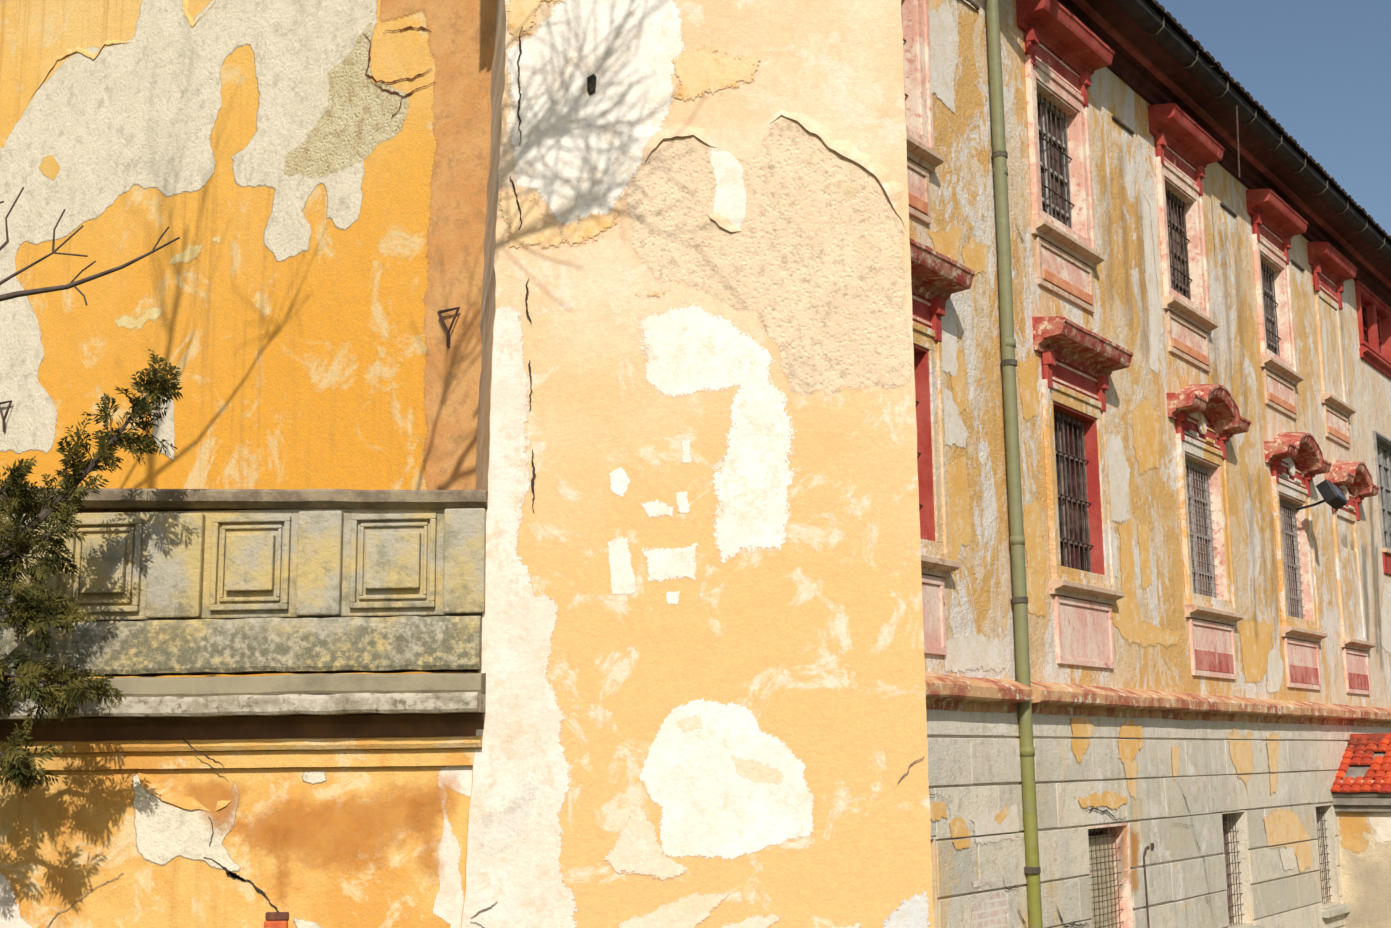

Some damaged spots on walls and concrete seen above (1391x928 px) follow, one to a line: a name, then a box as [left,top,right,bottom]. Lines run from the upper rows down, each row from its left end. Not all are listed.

crack [364,26,436,118]
crack [510,26,523,229]
crack [524,278,532,324]
crack [526,361,534,411]
flaking render [0,0,913,928]
crack [529,449,537,512]
crack [203,817,321,928]
peeling [1279,847,1296,871]
crack [470,901,497,928]
flaking render [881,891,931,928]